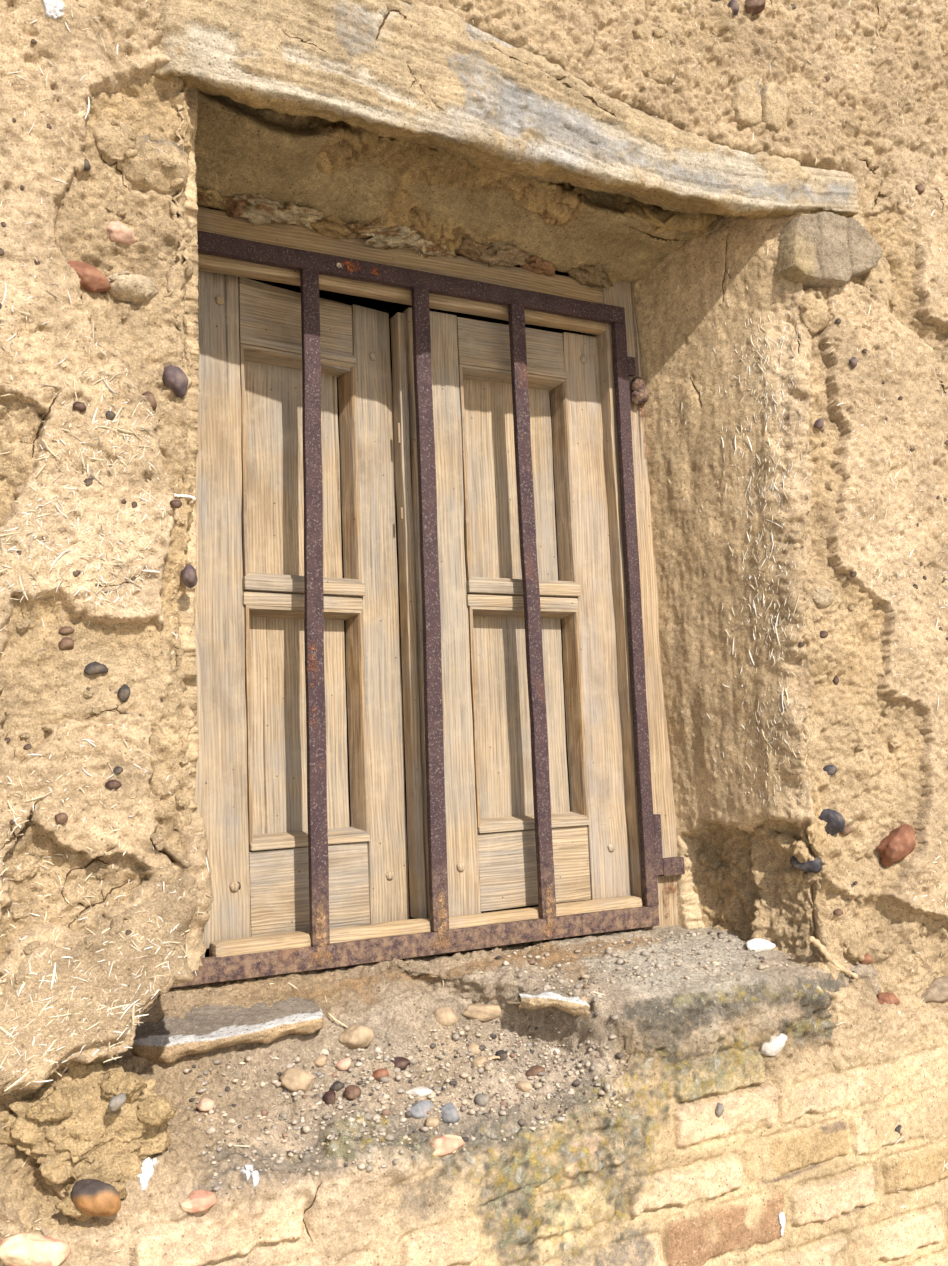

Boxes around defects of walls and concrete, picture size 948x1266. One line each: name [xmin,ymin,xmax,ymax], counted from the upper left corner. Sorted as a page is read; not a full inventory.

crack [282,30,327,52]
spalling [0,75,198,1123]
crack [61,846,134,929]
corrosion [311,908,331,961]
corrosion [446,888,650,979]
leakage [626,973,843,1067]
leakage [204,1076,599,1188]
spalling [0,1143,115,1233]
leakage [567,1230,652,1266]